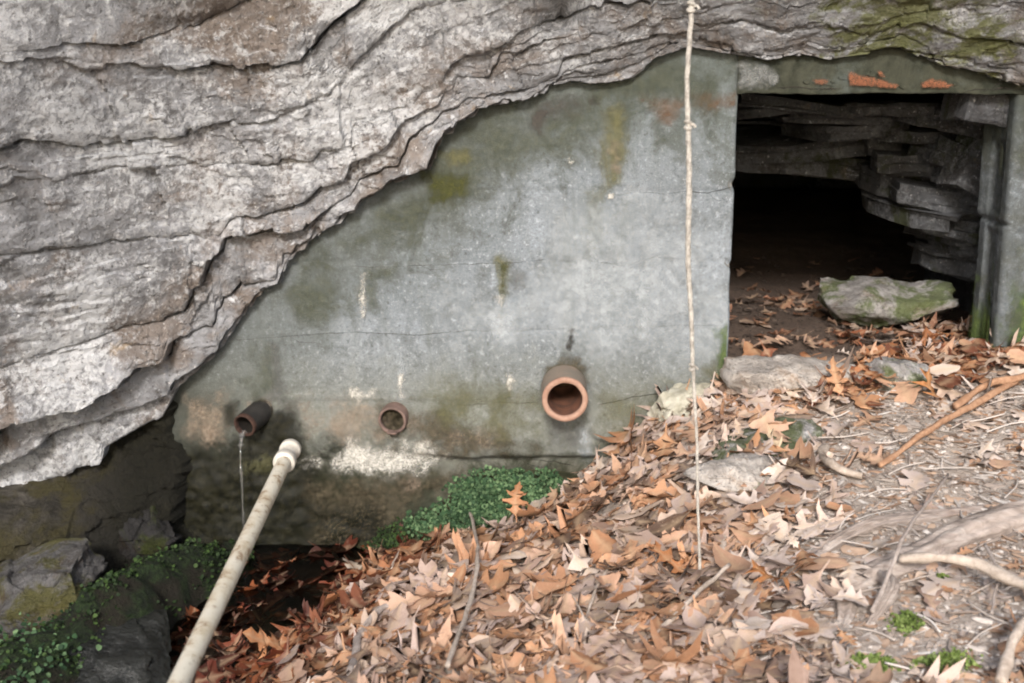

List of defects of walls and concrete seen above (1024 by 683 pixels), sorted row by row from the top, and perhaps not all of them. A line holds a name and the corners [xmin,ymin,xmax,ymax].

leakage [194,403,237,433]
leakage [183,412,297,547]
leakage [253,389,451,562]